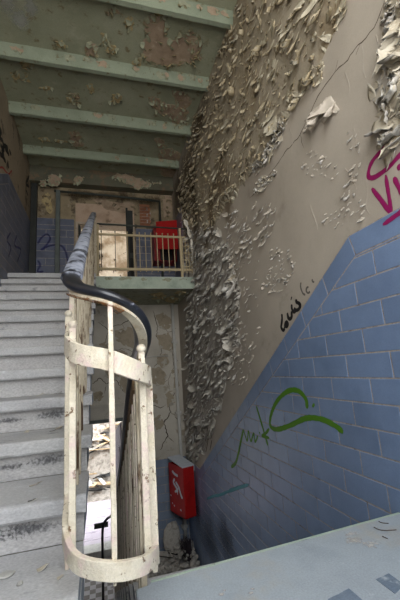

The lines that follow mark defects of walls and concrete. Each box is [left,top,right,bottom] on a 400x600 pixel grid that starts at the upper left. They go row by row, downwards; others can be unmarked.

crack [270,1,385,174]
peeling [346,0,400,171]
peeling [104,0,347,464]
peeling [321,162,366,229]